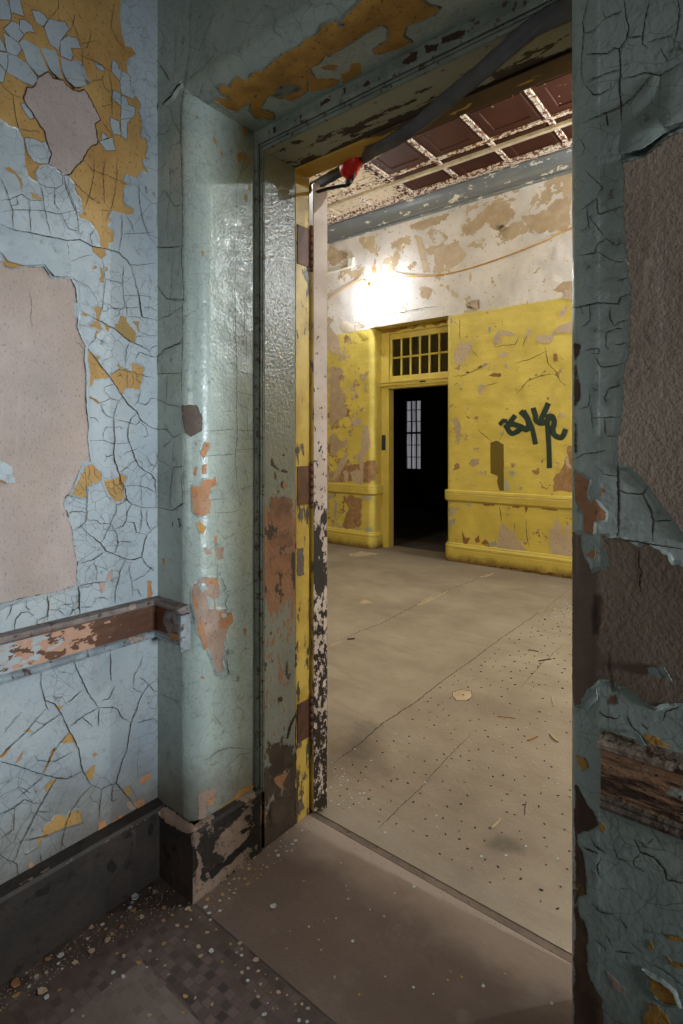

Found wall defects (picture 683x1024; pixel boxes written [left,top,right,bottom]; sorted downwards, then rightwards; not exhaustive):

flaking render [0,226,145,609]
peeling [0,0,150,283]
crack [1,1,212,630]
peeling [182,405,224,560]
peeling [211,0,465,137]
peeling [327,320,446,532]
peeling [408,196,572,273]
crack [571,0,682,593]
flaking render [611,64,683,542]
peeling [163,575,247,679]
crack [0,654,181,876]
peeling [573,785,605,1024]